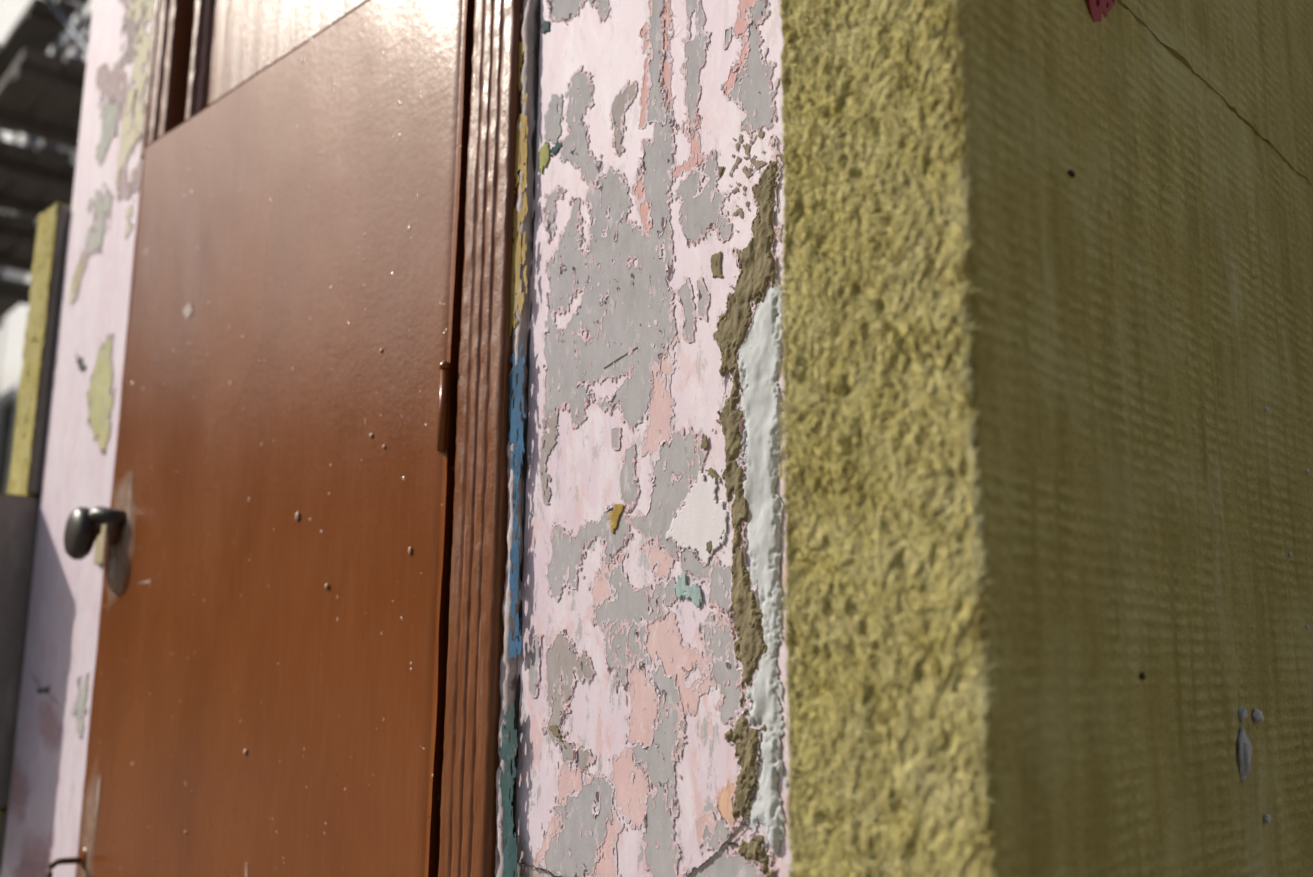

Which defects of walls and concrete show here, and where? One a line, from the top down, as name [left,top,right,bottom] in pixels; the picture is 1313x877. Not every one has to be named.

peeling [69,0,155,304]
peeling [76,333,115,455]
crack [519,0,541,639]
peeling [508,0,782,877]
peeling [499,703,518,877]
crack [511,673,561,877]
crack [687,730,763,877]